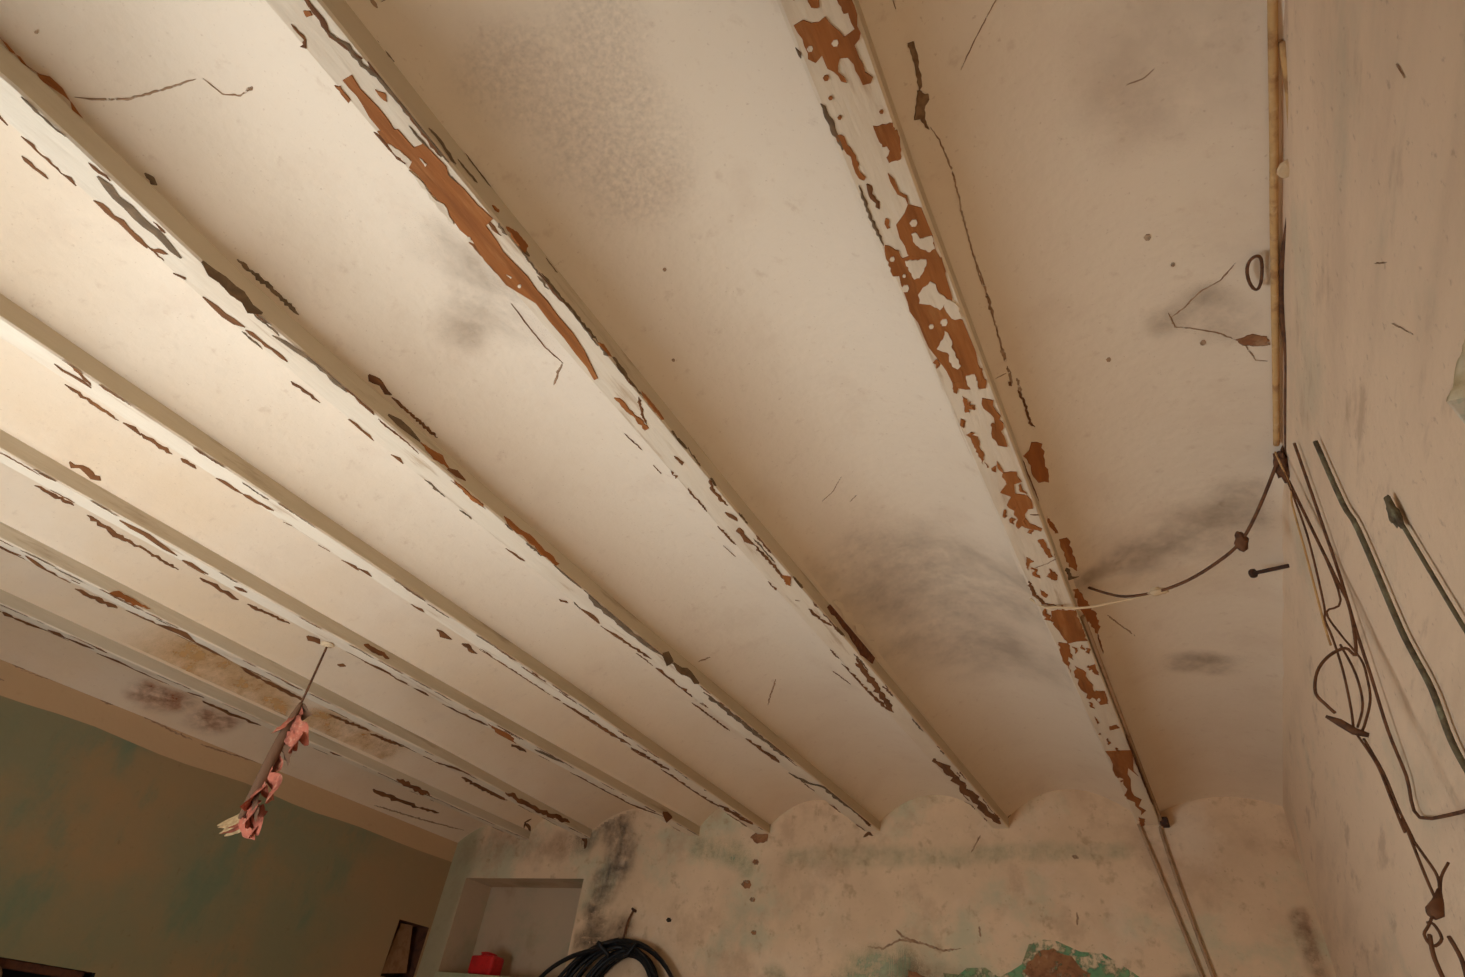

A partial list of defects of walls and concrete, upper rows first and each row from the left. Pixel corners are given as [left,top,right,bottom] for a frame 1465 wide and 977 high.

peeling [0,116,77,186]
peeling [21,97,66,137]
crack [75,79,253,101]
crack [961,0,996,69]
peeling [88,163,185,280]
crack [930,127,1022,392]
peeling [201,259,485,519]
peeling [291,0,894,713]
peeling [793,0,1153,826]
peeling [504,516,865,831]
peeling [943,941,1139,977]